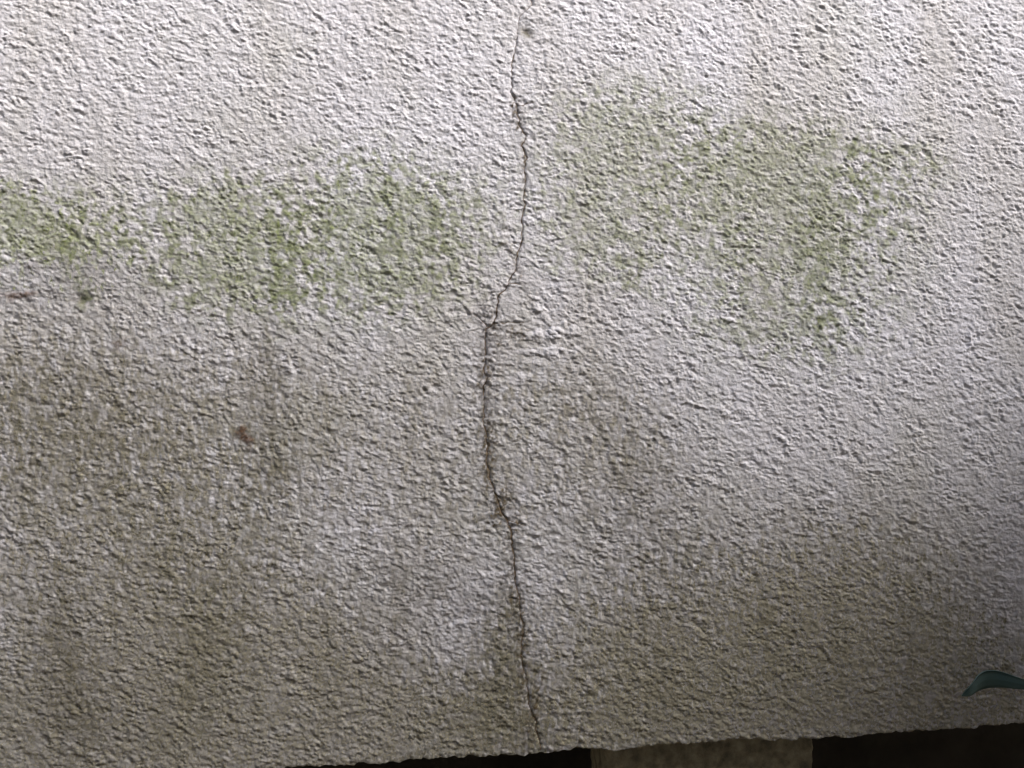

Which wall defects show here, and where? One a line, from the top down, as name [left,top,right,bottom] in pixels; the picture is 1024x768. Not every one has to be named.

crack [474,4,541,750]